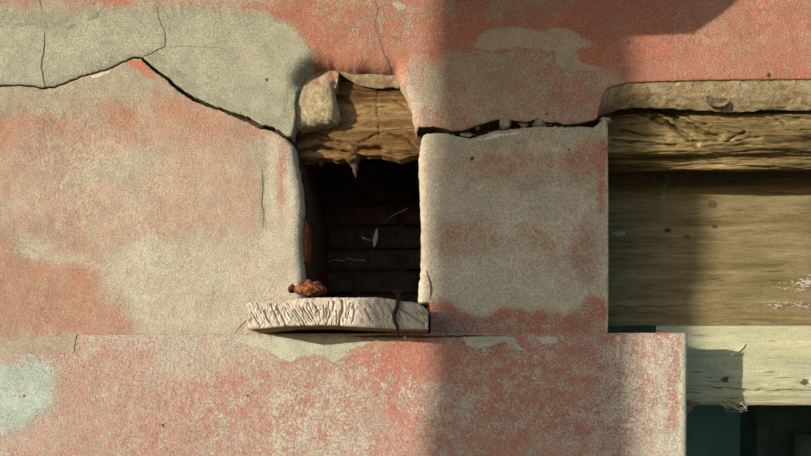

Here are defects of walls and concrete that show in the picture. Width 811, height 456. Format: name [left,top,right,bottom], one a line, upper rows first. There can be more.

crack [38,33,46,87]
peeling [128,60,155,79]
crack [143,9,296,146]
flaking render [296,69,400,134]
flaking render [475,26,600,73]
peeling [463,335,525,351]
peeling [232,333,373,456]